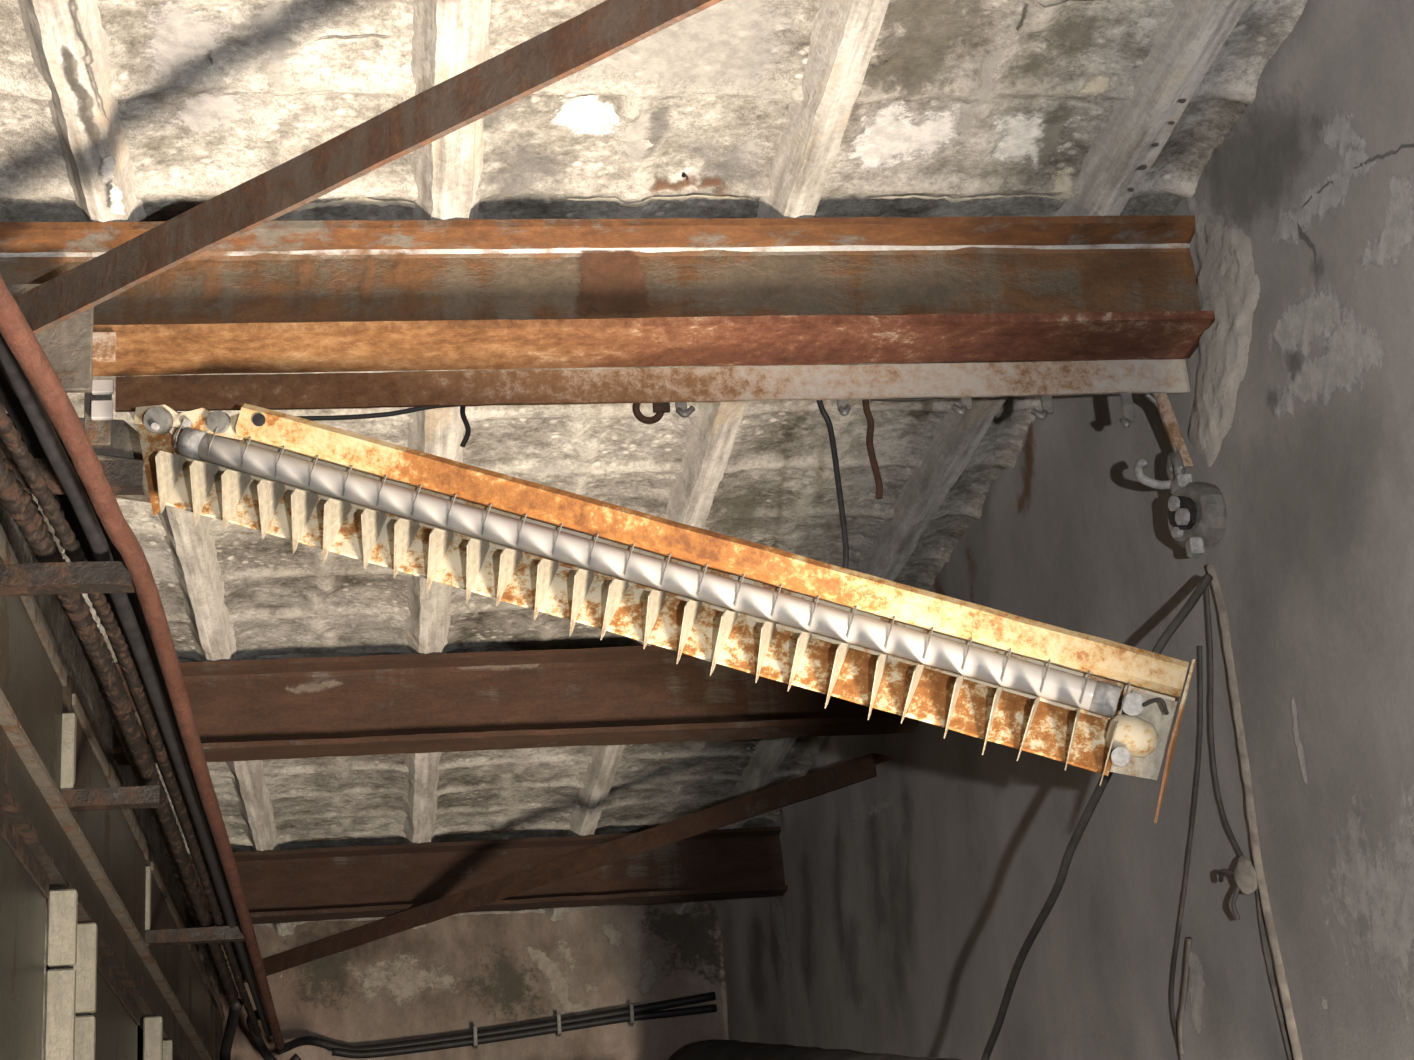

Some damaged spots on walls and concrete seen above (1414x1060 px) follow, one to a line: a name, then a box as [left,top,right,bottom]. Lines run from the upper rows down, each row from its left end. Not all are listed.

crack [63,0,109,145]
damp [553,0,787,164]
damp [848,0,1110,203]
damp [292,197,415,212]
damp [498,149,552,197]
damp [569,133,762,208]
damp [1272,110,1376,244]
crack [1297,144,1414,261]
damp [1362,176,1414,266]
corrosion [576,250,649,315]
damp [1332,785,1414,994]